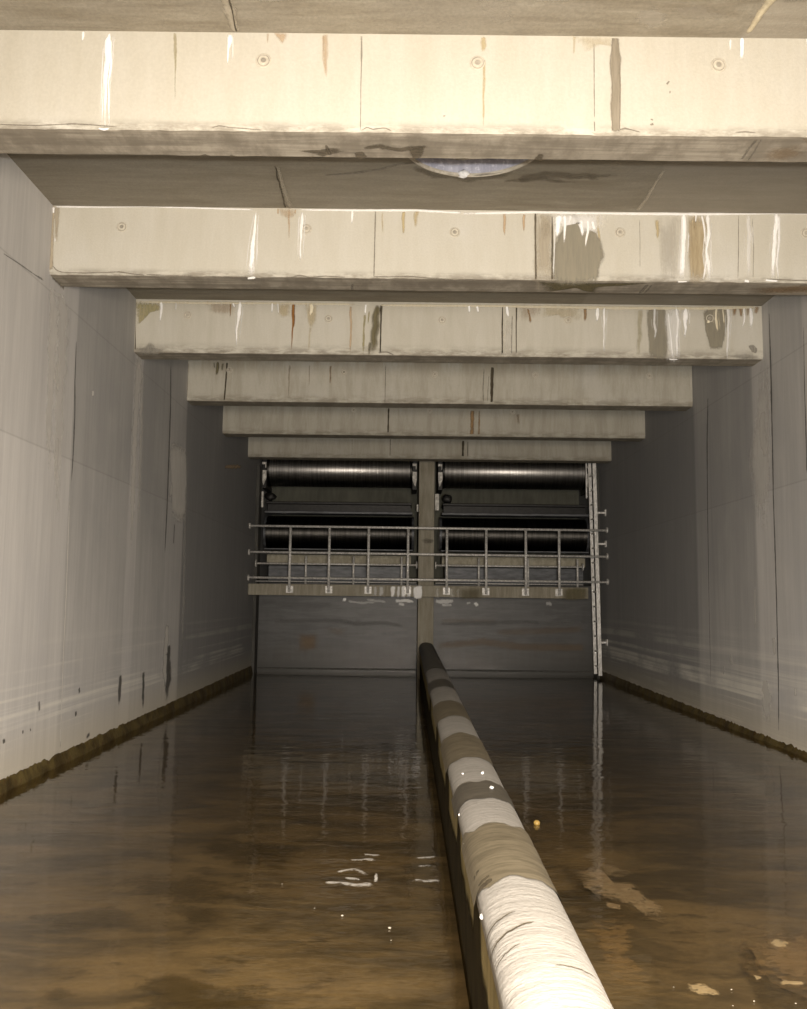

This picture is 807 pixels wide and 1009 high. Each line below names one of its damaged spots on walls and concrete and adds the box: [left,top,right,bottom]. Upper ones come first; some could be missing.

corrosion [610,38,621,131]
water stain [304,146,338,156]
water stain [298,209,780,283]
water stain [146,301,349,343]
water stain [365,304,753,360]